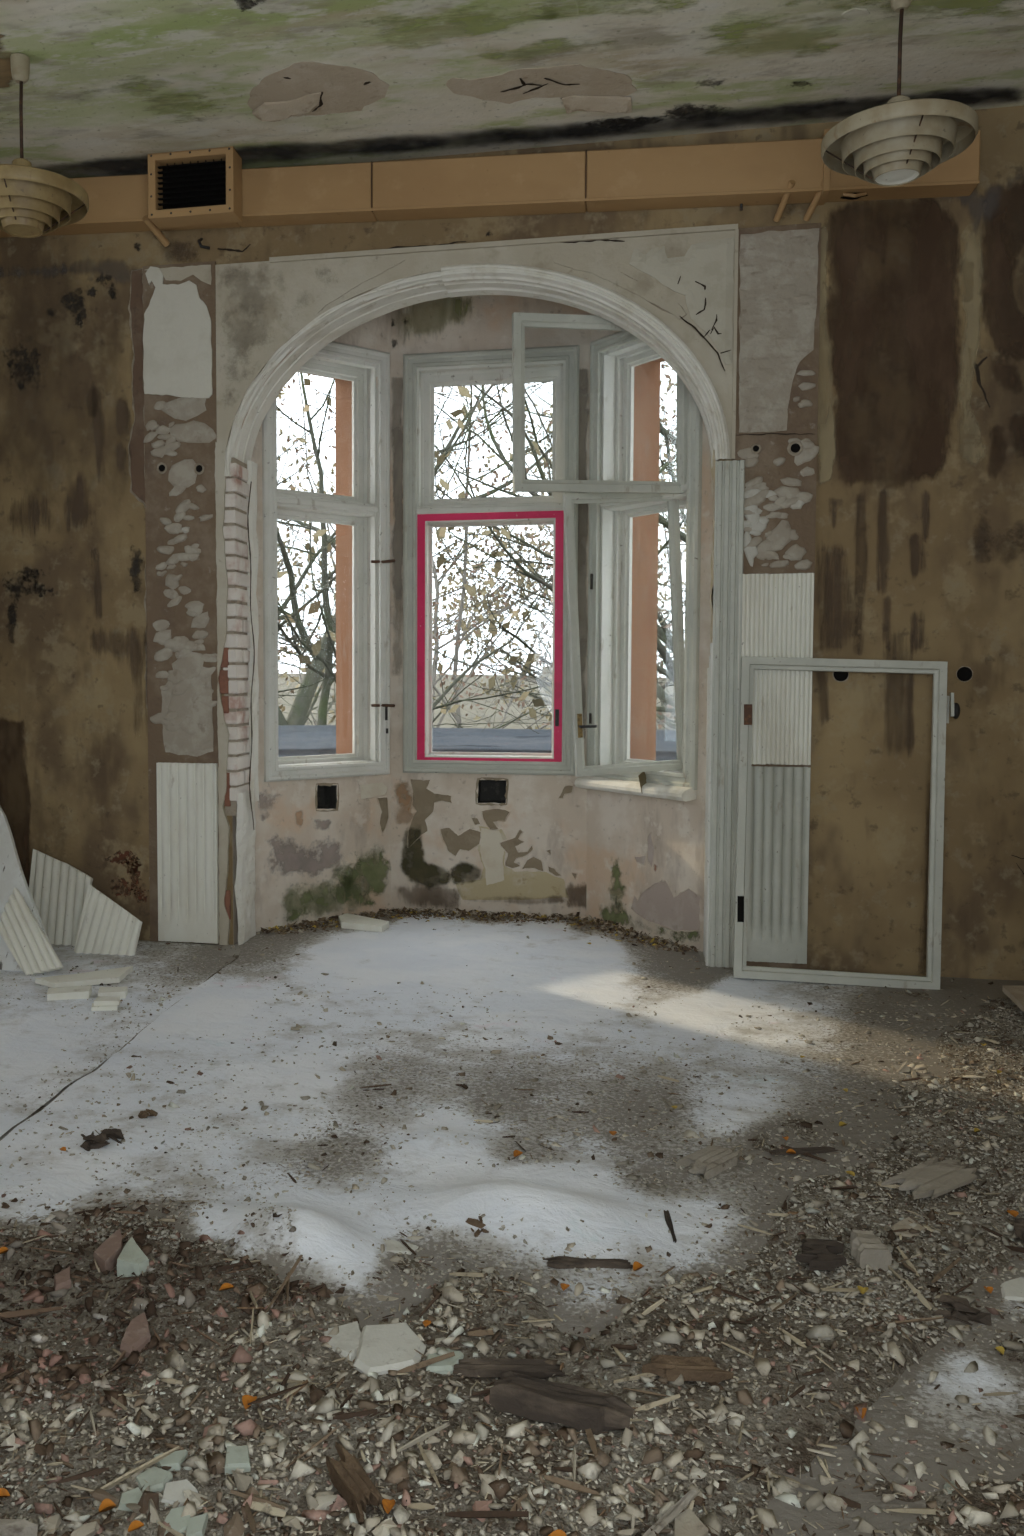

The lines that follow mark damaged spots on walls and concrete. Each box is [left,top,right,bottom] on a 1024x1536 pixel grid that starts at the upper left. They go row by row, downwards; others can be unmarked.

mould [234,0,264,12]
peeling [0,34,13,88]
peeling [247,61,390,122]
peeling [446,64,637,114]
leakage [586,81,722,124]
leakage [819,182,1024,754]
leakage [4,568,53,643]
leakage [92,547,146,675]
leakage [0,720,30,887]
peeling [376,796,389,834]
peeling [407,778,578,900]
peeling [630,833,702,932]